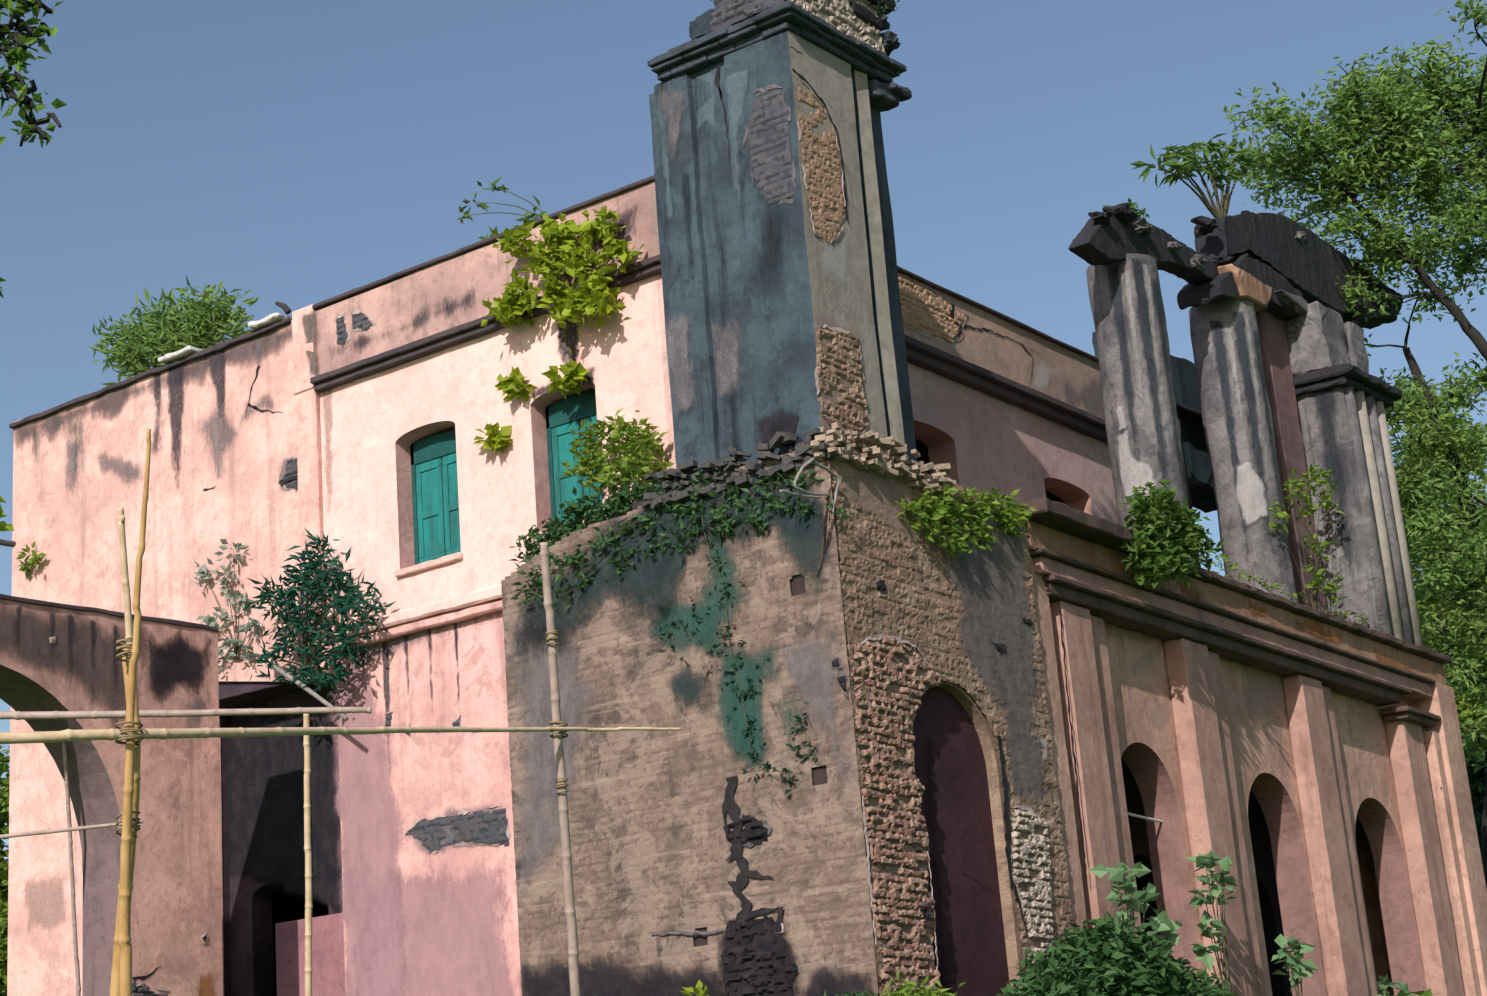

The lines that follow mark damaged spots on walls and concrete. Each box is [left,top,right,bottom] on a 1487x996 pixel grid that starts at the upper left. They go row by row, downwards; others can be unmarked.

spalling [696,72,845,242]
water stain [413,291,474,327]
spalling [898,274,969,344]
water stain [57,413,82,488]
water stain [153,366,183,471]
water stain [203,350,273,476]
crack [245,366,283,417]
spalling [814,315,870,438]
water stain [0,605,210,725]
water stain [227,618,725,996]
spalling [831,634,941,996]
spalling [1011,805,1054,964]